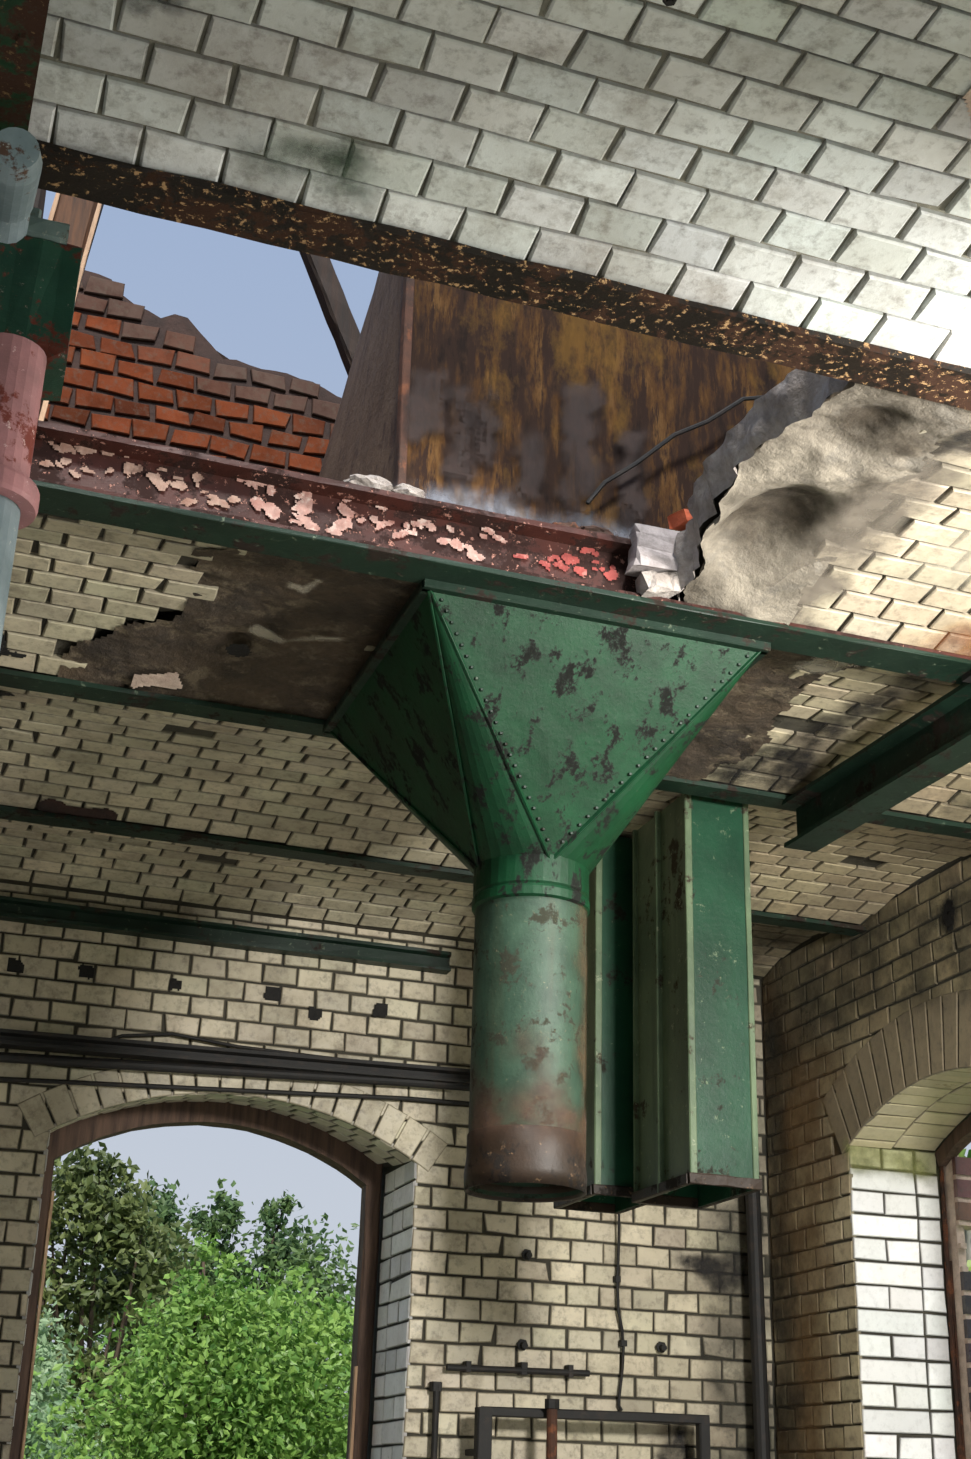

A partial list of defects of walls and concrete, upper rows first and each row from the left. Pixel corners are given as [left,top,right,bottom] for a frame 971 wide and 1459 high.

water stain [933,431,971,454]
spalling [58,548,418,720]
water stain [710,676,932,788]